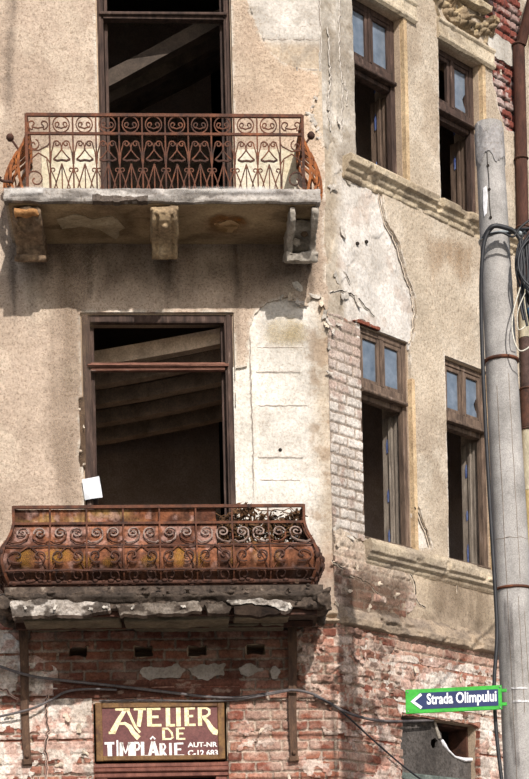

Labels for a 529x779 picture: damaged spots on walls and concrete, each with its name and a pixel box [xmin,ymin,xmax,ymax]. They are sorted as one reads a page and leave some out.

flaking render [478,0,522,45]
flaking render [492,57,515,132]
spalling [92,193,148,206]
spalling [57,214,125,239]
flaking render [233,0,504,779]
crack [409,574,426,609]
peeling [0,589,293,779]